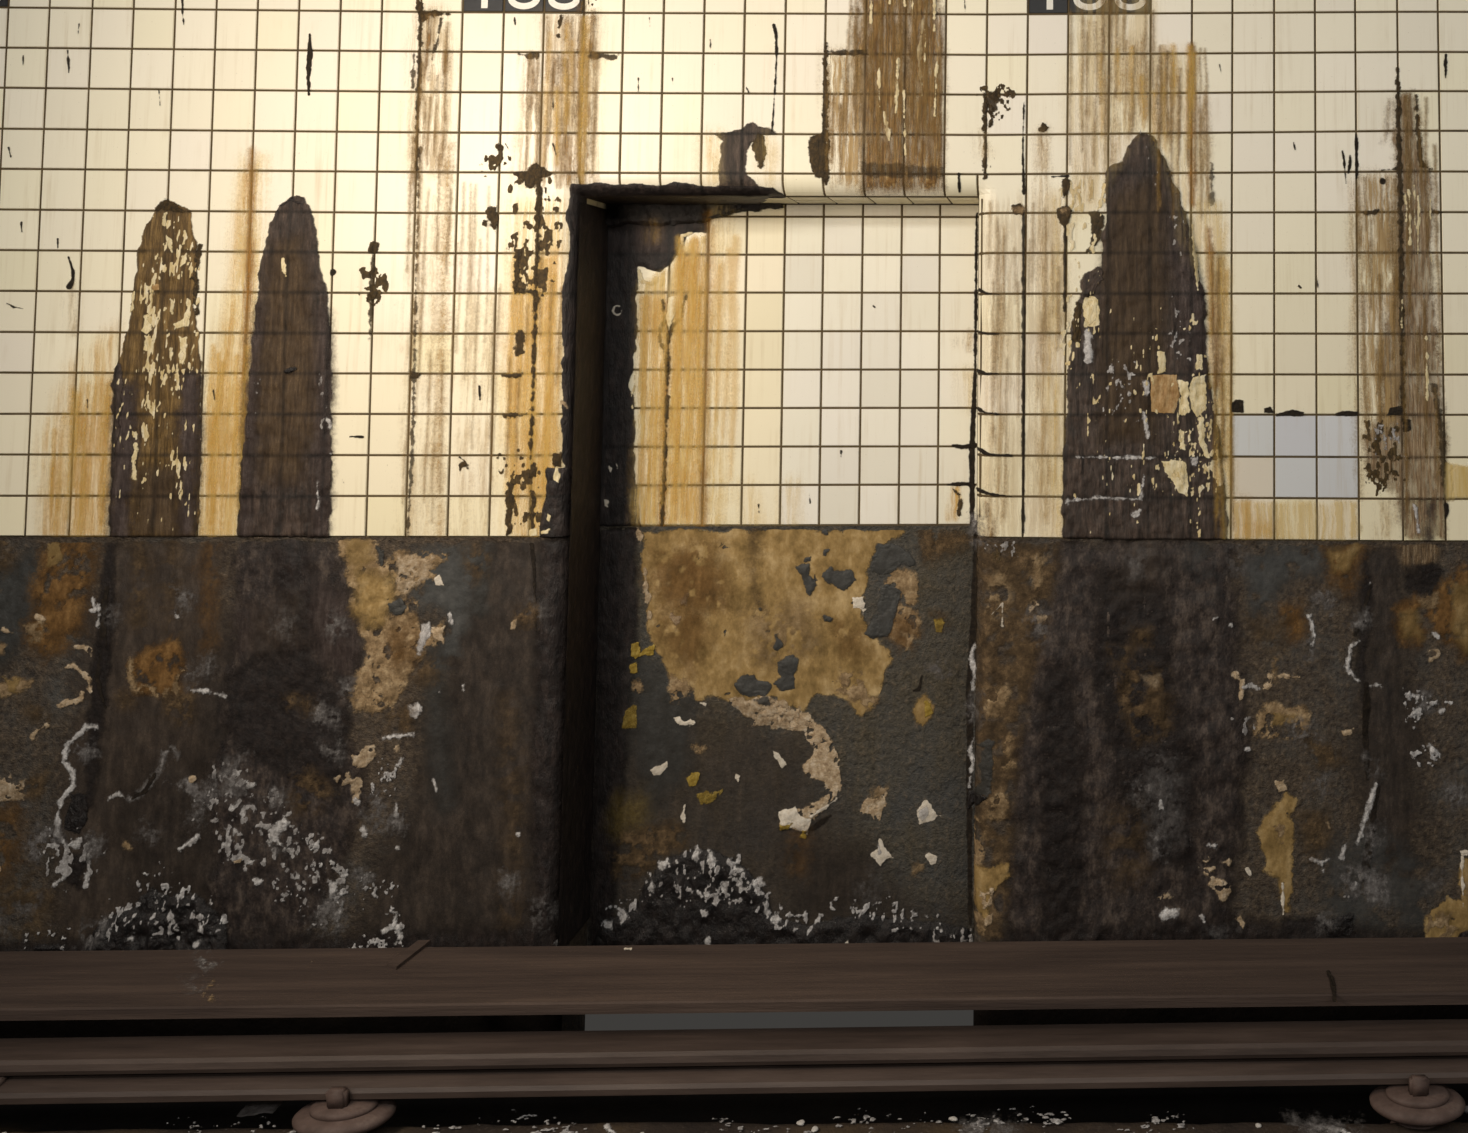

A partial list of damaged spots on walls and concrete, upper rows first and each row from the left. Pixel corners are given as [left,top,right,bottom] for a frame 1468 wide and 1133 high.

rust [405,0,451,533]
water stain [0,182,973,1000]
rust [481,0,619,537]
rust [634,212,720,527]
peeling [614,528,1056,939]
rust [808,0,943,191]
rust [1100,35,1215,206]
water stain [992,131,1424,942]
peeling [1203,780,1298,915]
rust [1352,67,1448,542]
peeling [1424,850,1468,937]